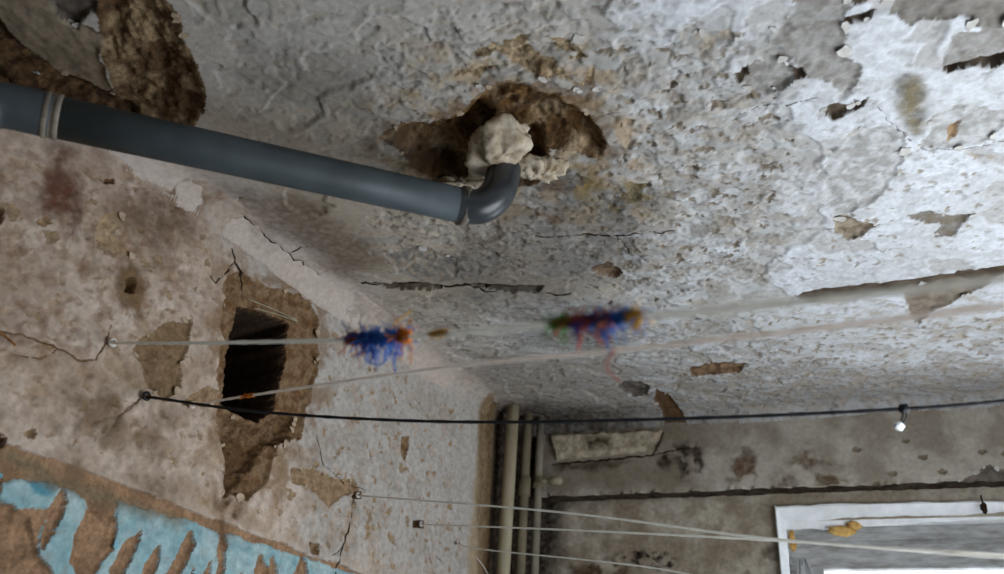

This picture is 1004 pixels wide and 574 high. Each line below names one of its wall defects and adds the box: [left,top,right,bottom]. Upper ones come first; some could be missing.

spalling [0,0,208,126]
spalling [374,0,1004,306]
peeling [0,201,25,225]
peeling [37,215,61,245]
crack [362,282,522,292]
crack [0,325,112,362]
spalling [0,270,465,574]